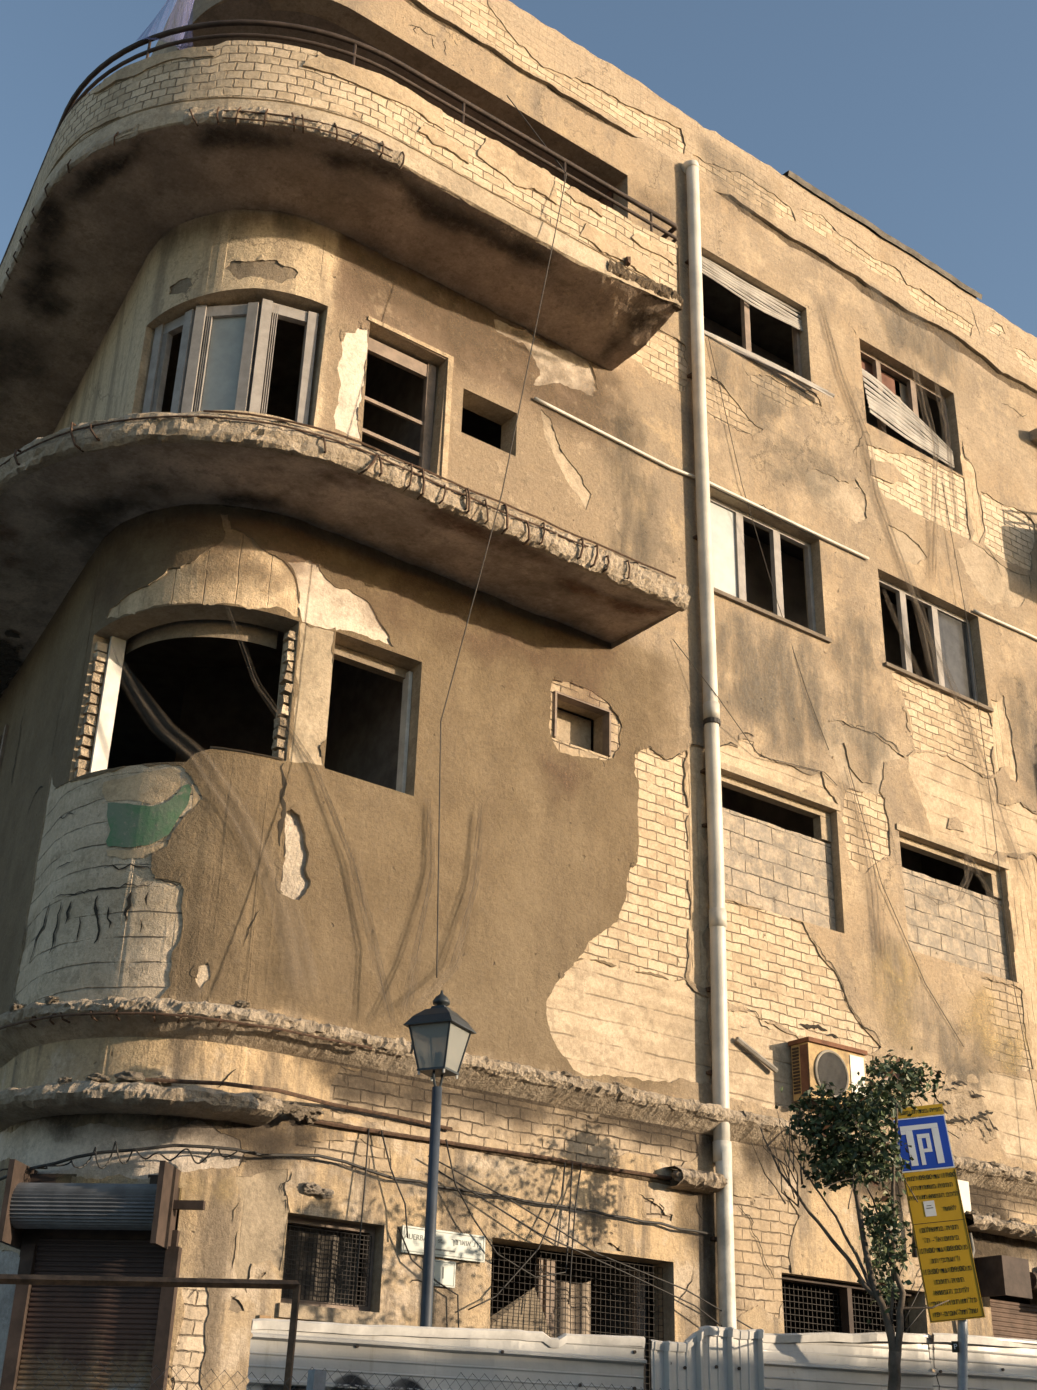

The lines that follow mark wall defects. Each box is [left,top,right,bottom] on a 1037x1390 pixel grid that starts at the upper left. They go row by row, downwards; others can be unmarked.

damp [23,201,64,312]
damp [76,154,131,194]
damp [327,154,550,266]
damp [359,255,542,365]
spalling [0,317,690,612]
flaking render [804,444,1035,608]
flaking render [107,512,397,765]
crack [833,719,914,756]
flaking render [0,641,414,1058]
crack [278,763,287,882]
flaking render [460,673,1037,1242]
flaking render [0,1068,799,1318]